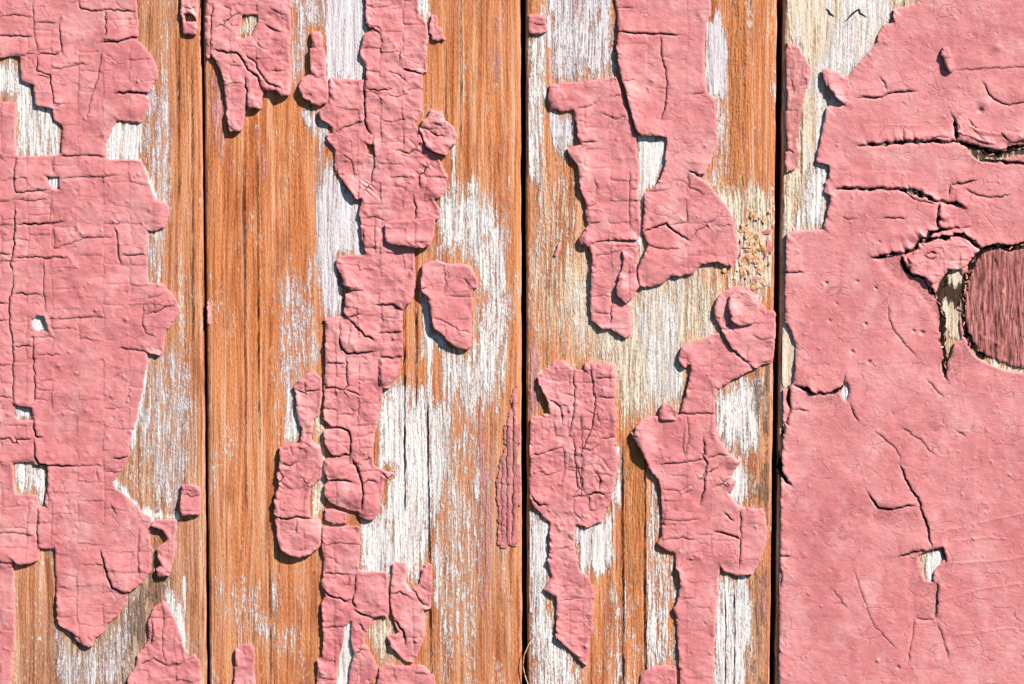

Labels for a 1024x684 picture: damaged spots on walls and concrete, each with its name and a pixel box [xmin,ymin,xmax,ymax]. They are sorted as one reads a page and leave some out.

peeling [0,0,202,684]
peeling [180,0,478,684]
peeling [496,360,619,665]
peeling [548,0,739,338]
peeling [631,286,795,684]
crack [776,379,856,484]
crack [859,76,914,99]
crack [835,427,949,665]
crack [843,110,1024,394]
peeling [908,239,974,287]
peeling [942,297,961,341]
crack [956,66,1023,106]